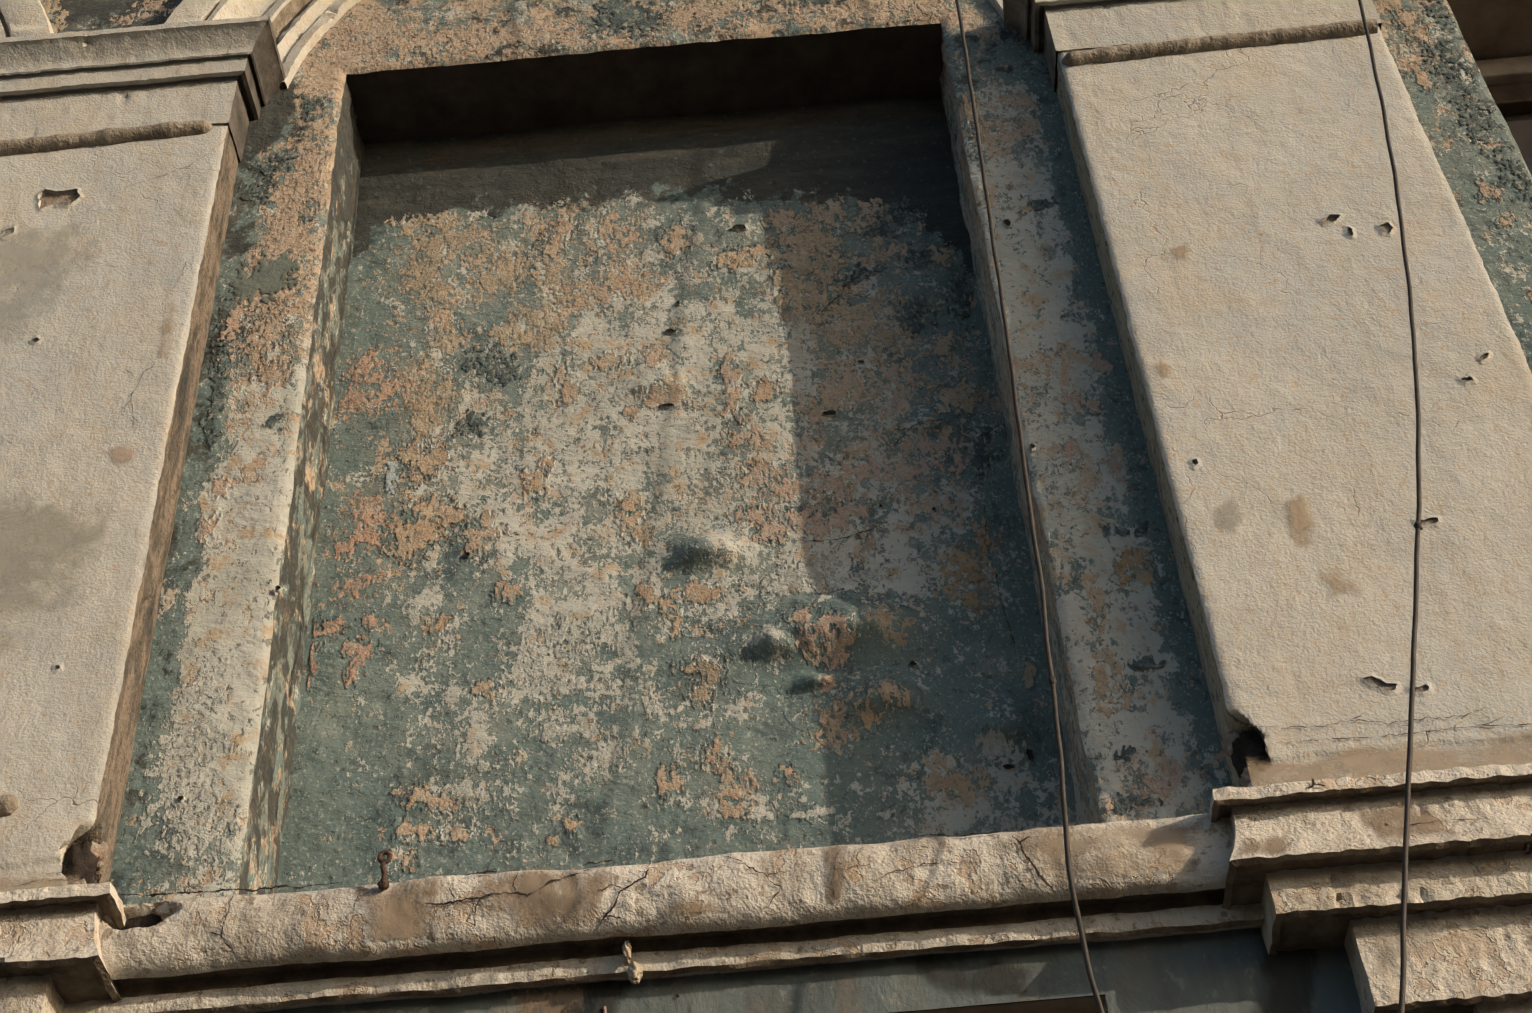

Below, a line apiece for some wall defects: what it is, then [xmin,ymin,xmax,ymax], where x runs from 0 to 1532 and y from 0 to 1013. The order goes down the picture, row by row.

peeling [646,0,954,33]
spalling [34,187,85,213]
peeling [253,115,331,273]
peeling [306,189,960,693]
peeling [462,347,1009,828]
peeling [135,653,246,866]
spalling [1222,730,1271,787]
peeling [372,760,500,874]
spalling [62,840,108,884]
crack [415,859,651,931]
crack [724,856,785,909]
crack [831,831,1054,905]